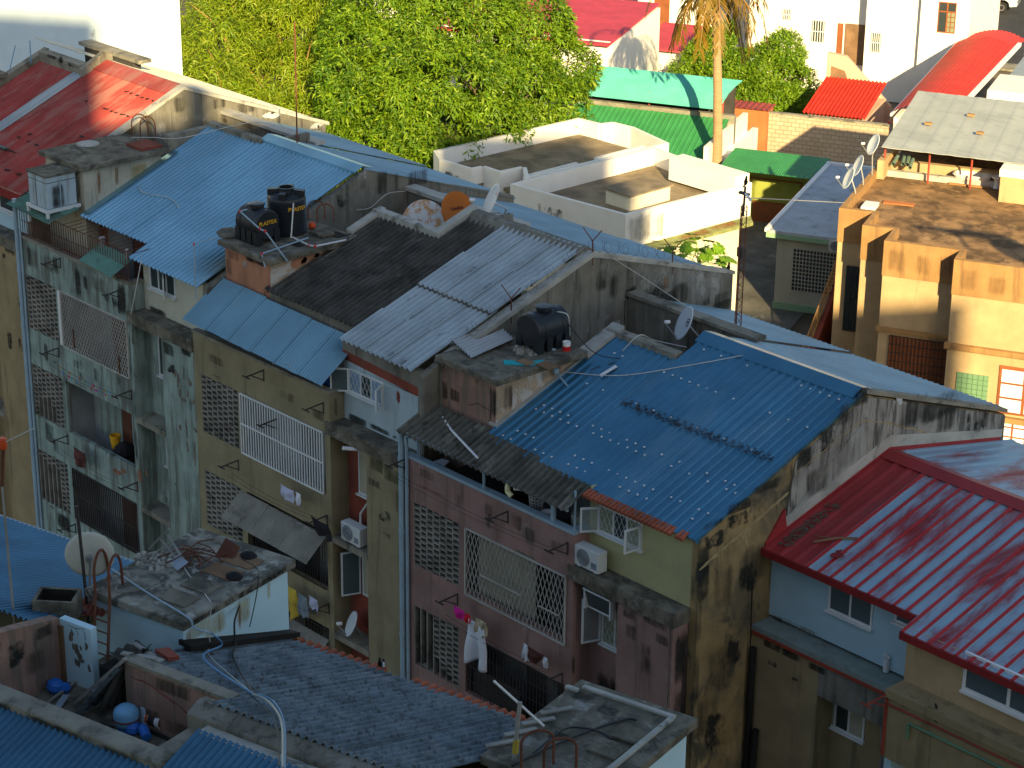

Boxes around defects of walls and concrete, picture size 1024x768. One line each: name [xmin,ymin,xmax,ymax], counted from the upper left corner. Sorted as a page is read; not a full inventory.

water stain [75,270,87,294]
water stain [105,286,126,314]
water stain [163,342,191,374]
water stain [906,393,957,431]
water stain [799,388,868,489]
water stain [696,479,779,607]
water stain [724,641,740,675]
water stain [764,640,824,674]
water stain [698,709,724,752]